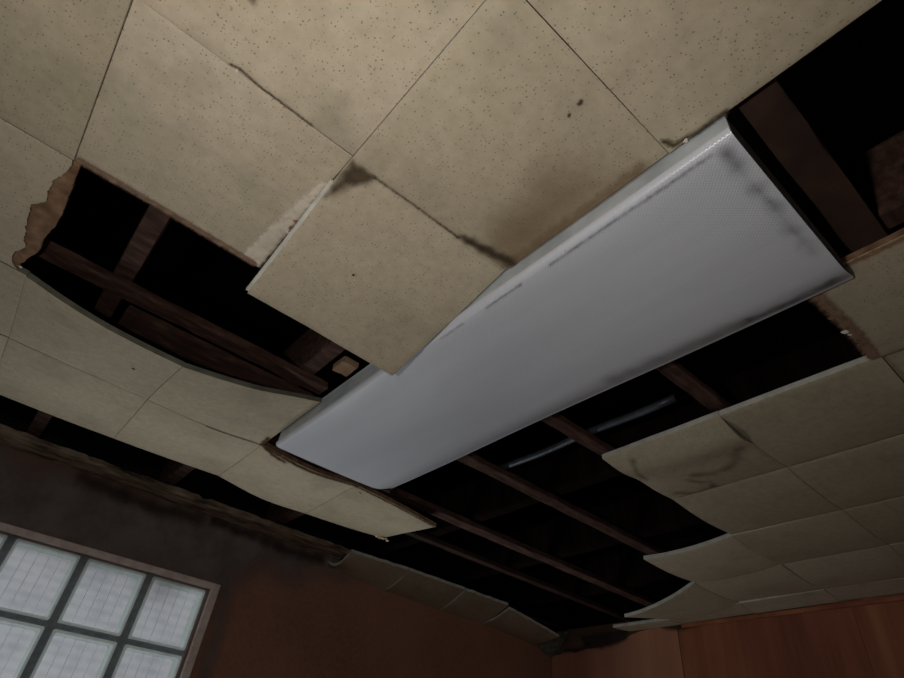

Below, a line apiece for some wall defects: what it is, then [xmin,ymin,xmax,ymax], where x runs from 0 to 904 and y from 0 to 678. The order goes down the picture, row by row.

spalling [13,158,327,268]
water stain [332,162,511,263]
spalling [810,293,879,358]